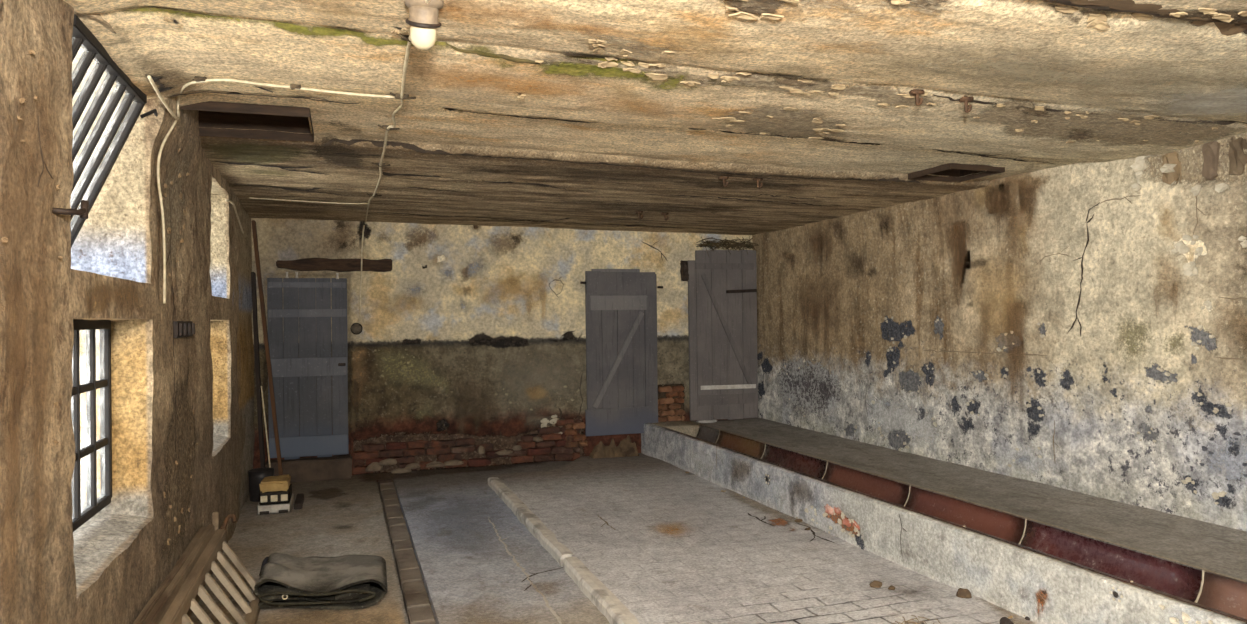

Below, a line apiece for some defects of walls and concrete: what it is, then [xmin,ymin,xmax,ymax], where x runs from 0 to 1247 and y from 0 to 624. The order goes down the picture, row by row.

spalling [726,0,859,20]
peeling [1170,7,1247,23]
flaking render [1130,127,1247,197]
crack [1036,195,1142,337]
peeling [864,316,936,421]
peeling [1144,363,1178,384]
peeling [1185,325,1217,365]
flaking render [350,414,588,475]
peeling [950,396,981,435]
peeling [1025,366,1075,458]
peeling [1181,387,1247,510]
flaking render [796,504,865,550]